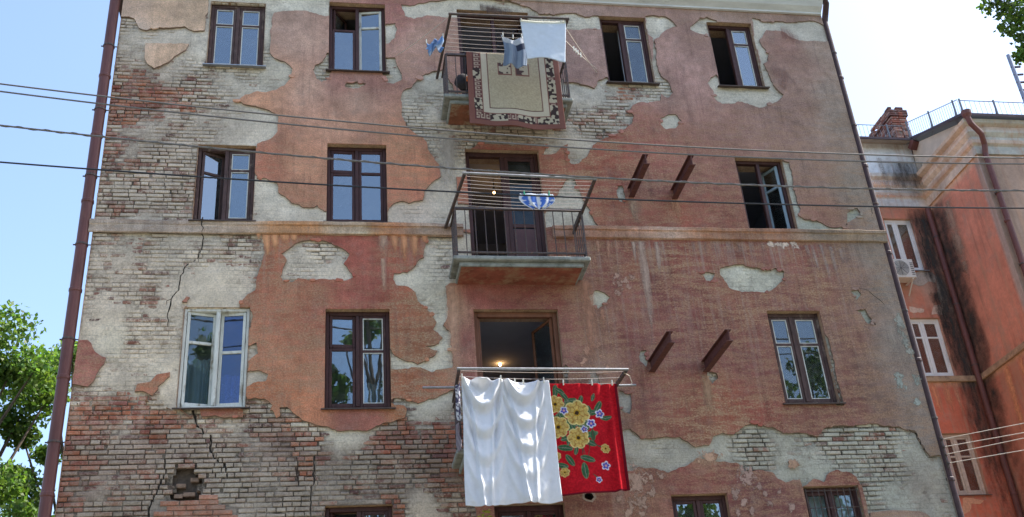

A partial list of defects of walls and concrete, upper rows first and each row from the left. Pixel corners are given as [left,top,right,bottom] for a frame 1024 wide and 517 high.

spalling [95,0,331,221]
spalling [659,115,684,129]
spalling [382,16,676,372]
crack [166,217,204,325]
spalling [698,265,787,294]
spalling [56,232,476,517]
damp [910,200,1005,499]
crack [148,459,170,517]
crack [192,410,228,478]
spalling [616,420,984,517]